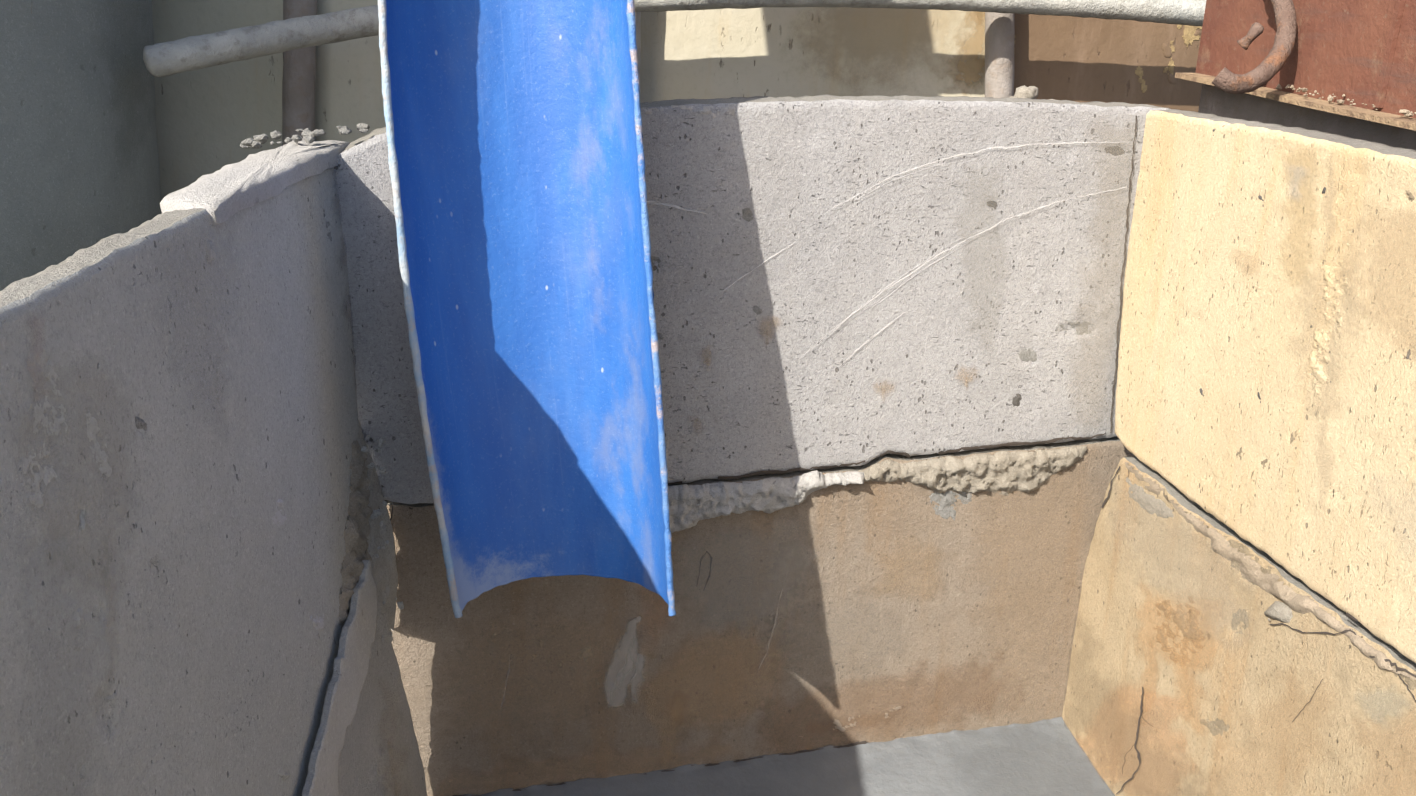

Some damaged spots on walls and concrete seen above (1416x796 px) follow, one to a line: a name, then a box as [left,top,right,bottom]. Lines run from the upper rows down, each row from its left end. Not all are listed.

peeling [1162,25,1202,85]
crack [717,116,1137,480]
crack [1101,466,1121,508]
damp [606,616,644,706]
crack [1116,687,1153,794]
crack [1292,679,1323,722]
crack [1269,612,1416,701]